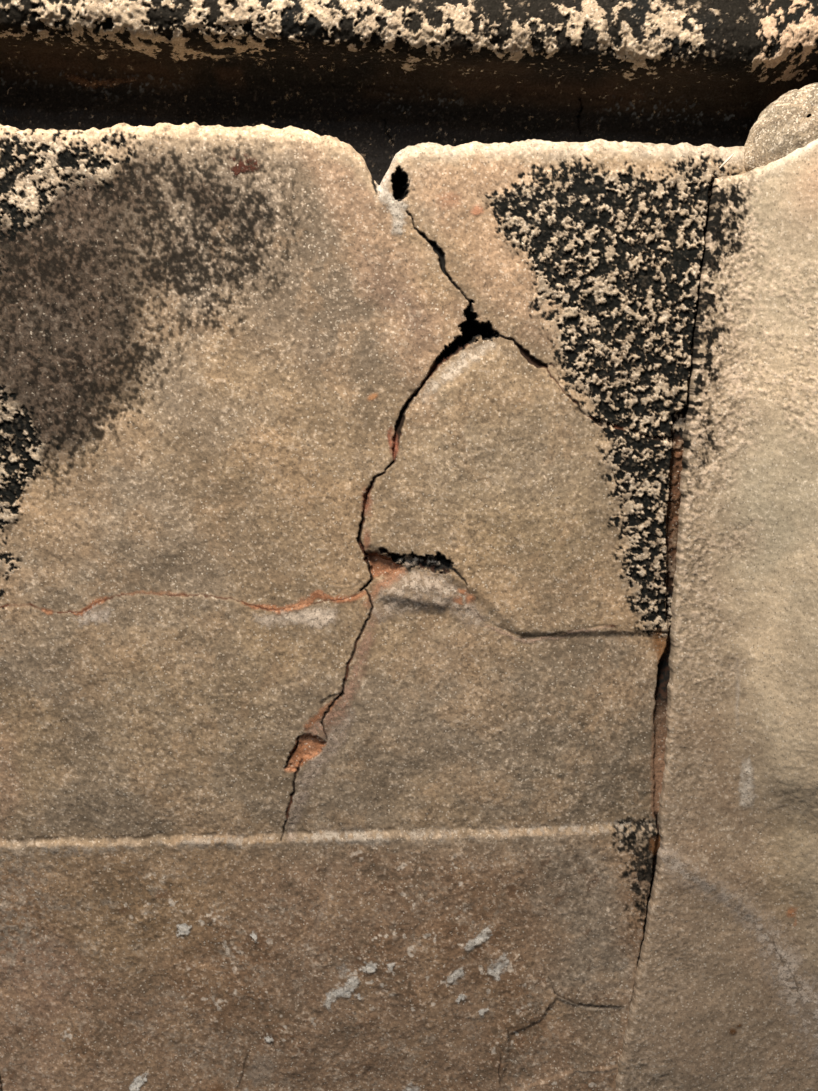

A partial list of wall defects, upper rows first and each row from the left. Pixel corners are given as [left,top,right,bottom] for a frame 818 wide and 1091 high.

damp [0,128,141,239]
crack [170,120,693,738]
damp [0,385,59,609]
crack [0,593,124,616]
damp [79,610,109,624]
spalling [285,548,485,839]
crack [280,739,303,840]
crack [644,814,659,926]